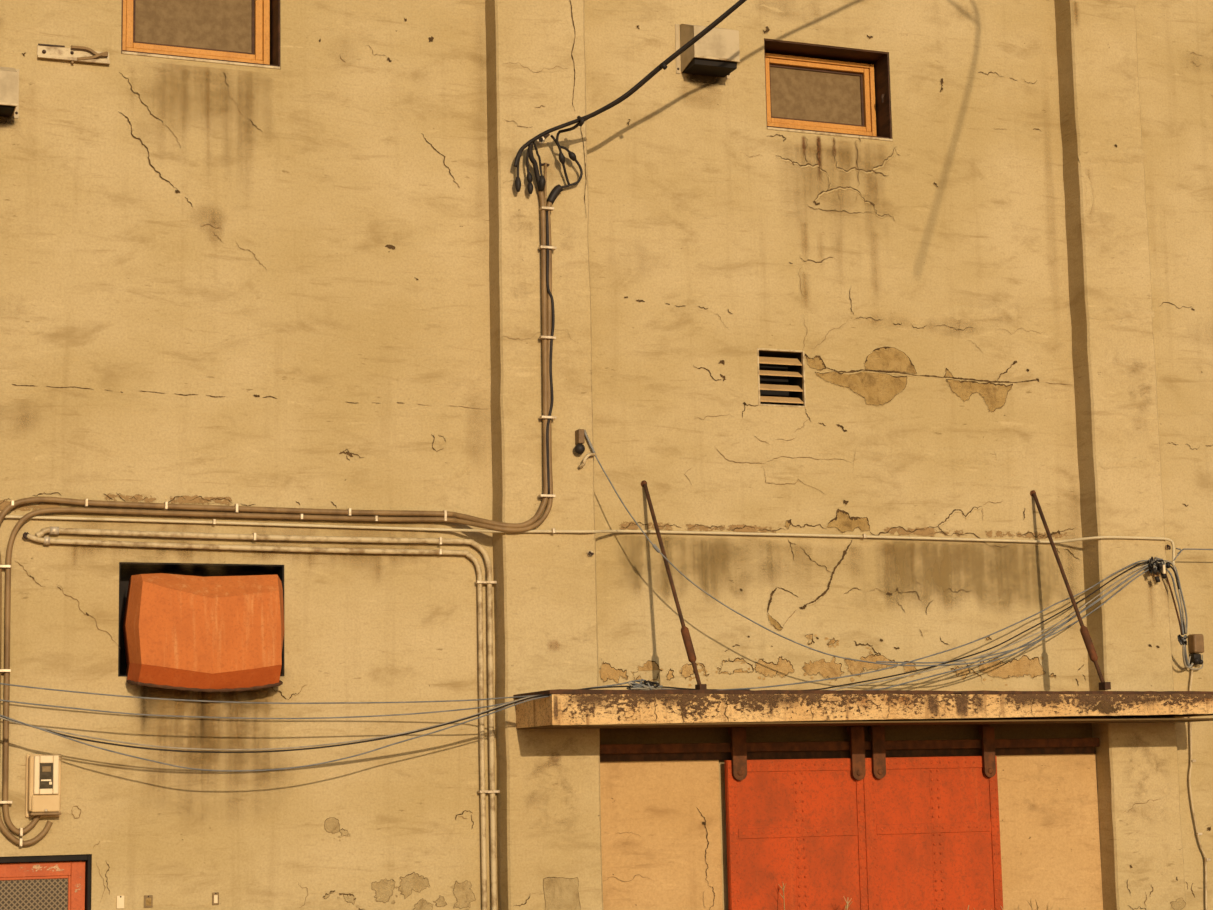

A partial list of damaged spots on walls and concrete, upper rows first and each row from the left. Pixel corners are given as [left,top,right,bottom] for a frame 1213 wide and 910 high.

crack [118,72,267,270]
crack [751,134,901,221]
spalling [804,346,917,407]
spalling [943,367,1013,413]
crack [698,402,857,494]
spalling [826,499,967,537]
crack [619,501,1076,677]
leakage [886,542,1042,602]
leakage [148,687,187,698]
leakage [190,688,263,763]
peeling [559,633,1213,724]
peeling [323,872,476,910]